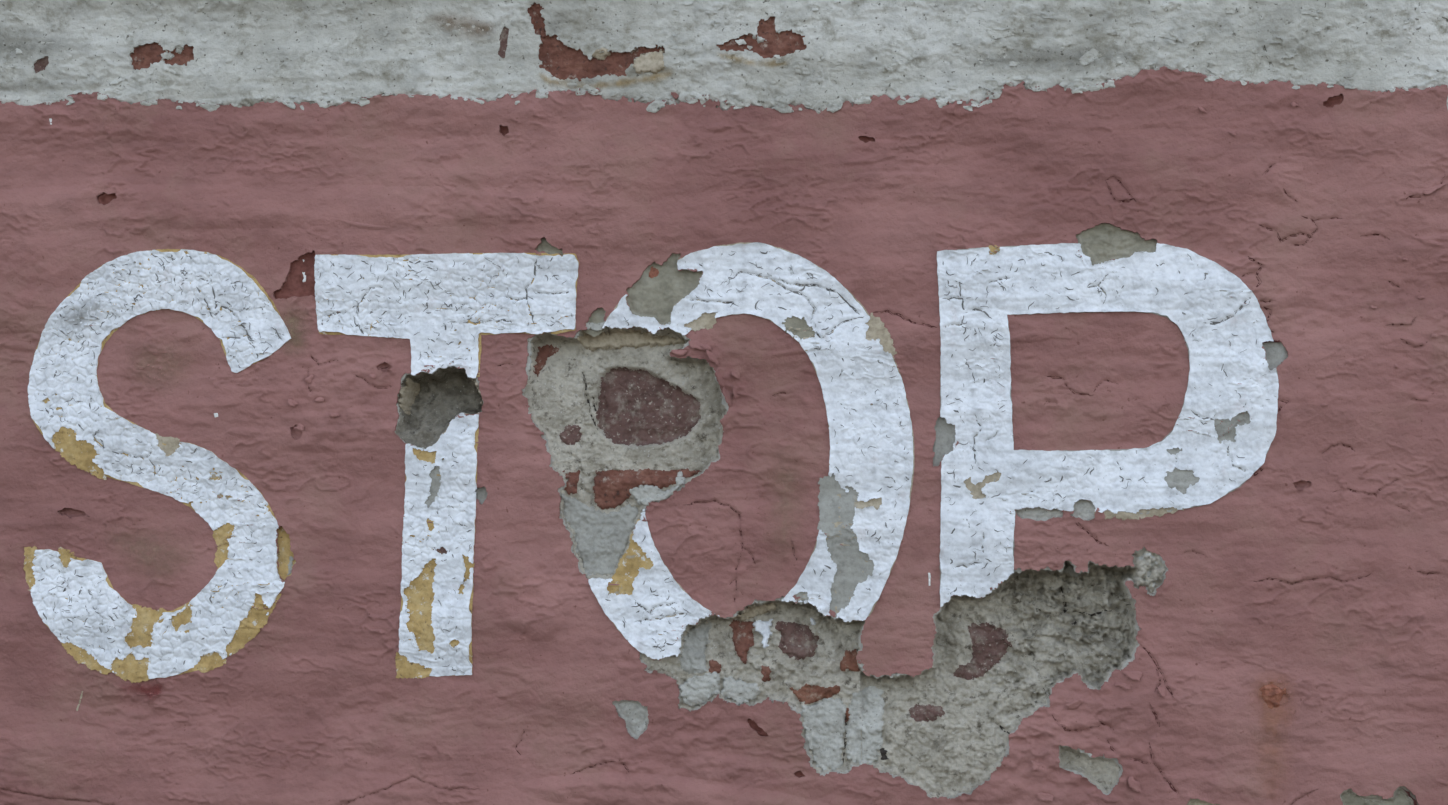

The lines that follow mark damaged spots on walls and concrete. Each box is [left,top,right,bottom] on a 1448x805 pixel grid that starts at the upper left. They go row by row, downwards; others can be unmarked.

flaking render [40,27,428,112]
flaking render [448,0,1247,114]
peeling [52,427,107,480]
flaking render [522,253,740,595]
peeling [23,546,38,591]
peeling [212,523,234,569]
peeling [277,526,296,580]
flaking render [377,362,484,679]
peeling [61,603,192,683]
peeling [194,593,273,673]
flaking render [639,471,1168,805]
flaking render [613,700,649,739]